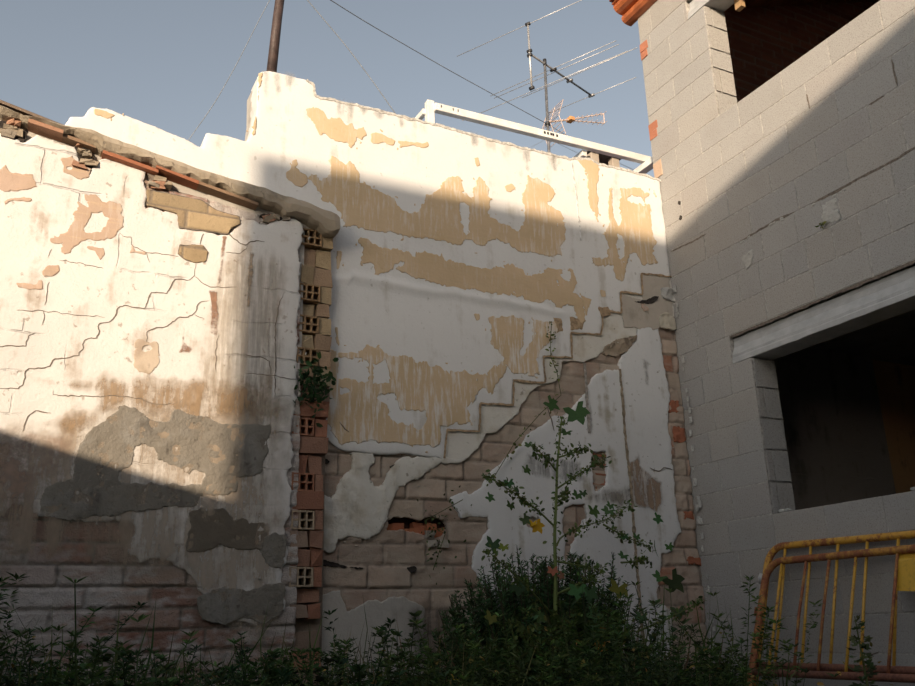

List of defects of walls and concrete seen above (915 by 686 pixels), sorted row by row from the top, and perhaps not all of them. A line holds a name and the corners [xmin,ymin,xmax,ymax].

peeling [50,194,124,260]
crack [23,390,175,430]
crack [0,234,228,389]
flaking render [146,189,241,235]
crack [228,233,264,254]
crack [245,297,296,392]
peeling [286,156,606,324]
peeling [578,160,658,281]
leakage [0,415,87,553]
leakage [98,378,278,597]
flaking render [323,313,625,678]
flaking render [657,328,710,678]